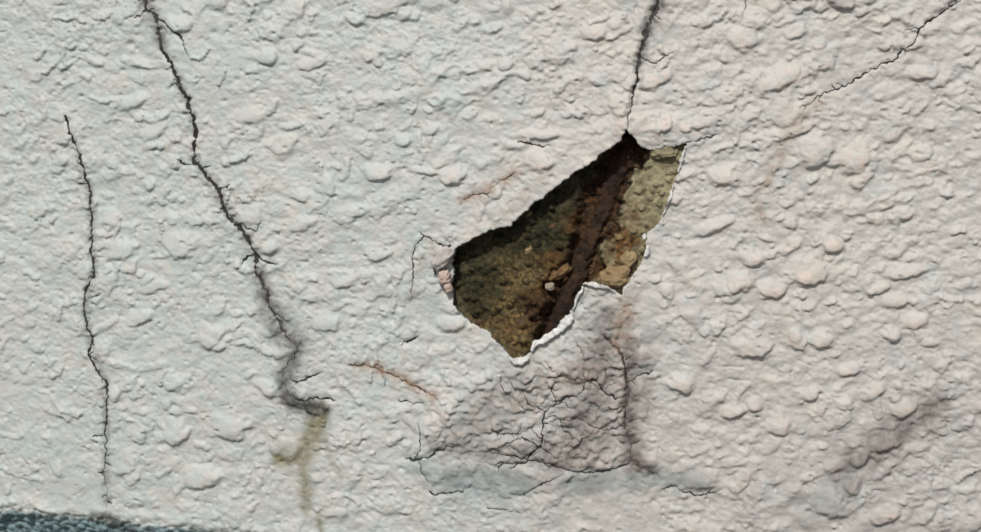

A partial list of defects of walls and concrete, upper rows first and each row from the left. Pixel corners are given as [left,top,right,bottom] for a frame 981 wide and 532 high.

crack [627,0,673,128]
crack [790,0,961,127]
crack [64,115,112,504]
crack [133,0,335,407]
crack [410,231,451,297]
crack [463,172,515,200]
spalling [431,130,687,365]
leakage [274,394,329,464]
crack [350,363,471,496]
crack [482,335,722,514]